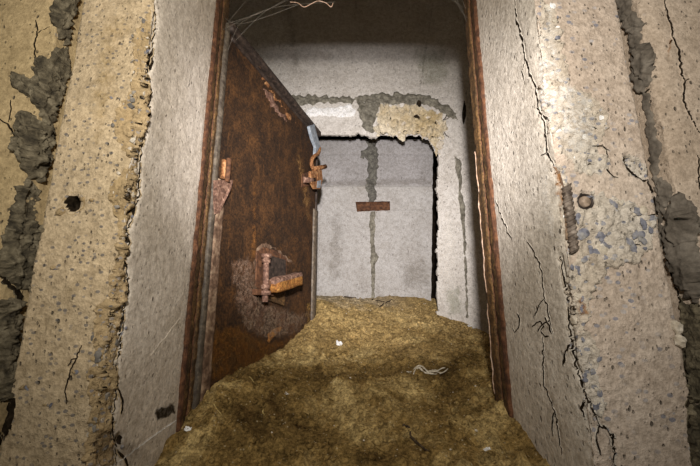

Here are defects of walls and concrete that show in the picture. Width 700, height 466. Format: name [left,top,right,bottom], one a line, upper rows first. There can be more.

peeling [306,104,356,118]
spalling [373,100,448,156]
crack [514,0,557,172]
crack [663,0,700,134]
spalling [71,9,154,466]
crack [64,345,83,404]
crack [495,201,617,466]